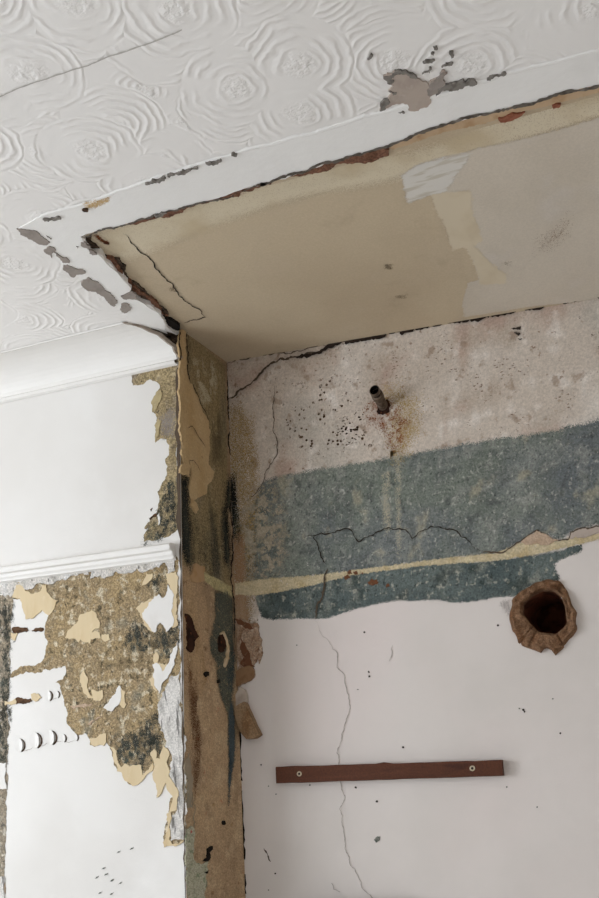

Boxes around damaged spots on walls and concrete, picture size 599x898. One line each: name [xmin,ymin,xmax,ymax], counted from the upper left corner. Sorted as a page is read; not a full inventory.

crack [0,29,182,97]
peeling [380,45,507,114]
peeling [145,152,237,185]
peeling [17,228,136,313]
crack [125,234,205,323]
corrosion [362,381,429,469]
crack [226,301,576,497]
flaking render [227,298,599,582]
spalling [0,555,176,597]
leakage [142,329,262,807]
peeling [14,730,79,752]
crack [305,525,599,898]